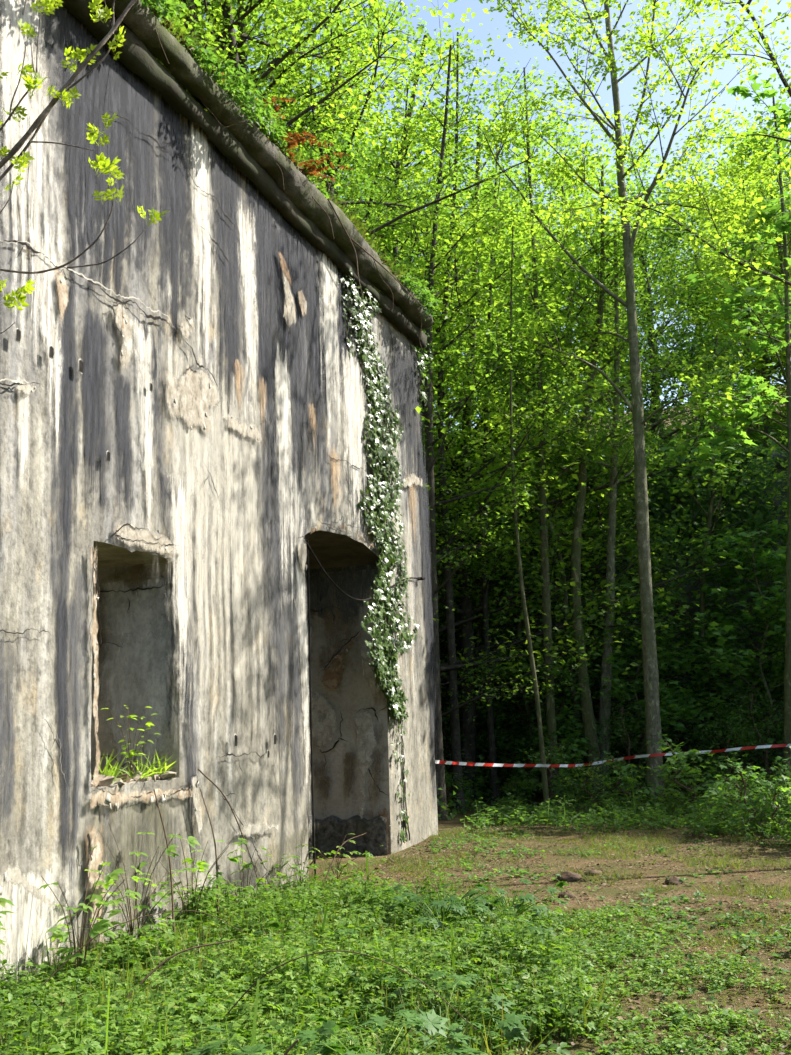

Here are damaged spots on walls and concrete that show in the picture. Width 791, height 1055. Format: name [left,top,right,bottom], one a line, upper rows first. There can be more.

spalling [278,250,307,328]
crack [0,240,220,408]
damp [0,0,368,912]
peeling [166,371,218,435]
peeling [227,415,262,443]
spalling [403,471,424,488]
spalling [115,523,182,555]
damp [384,335,437,796]
spalling [89,541,203,833]
peeling [309,693,337,747]
crack [312,707,386,769]